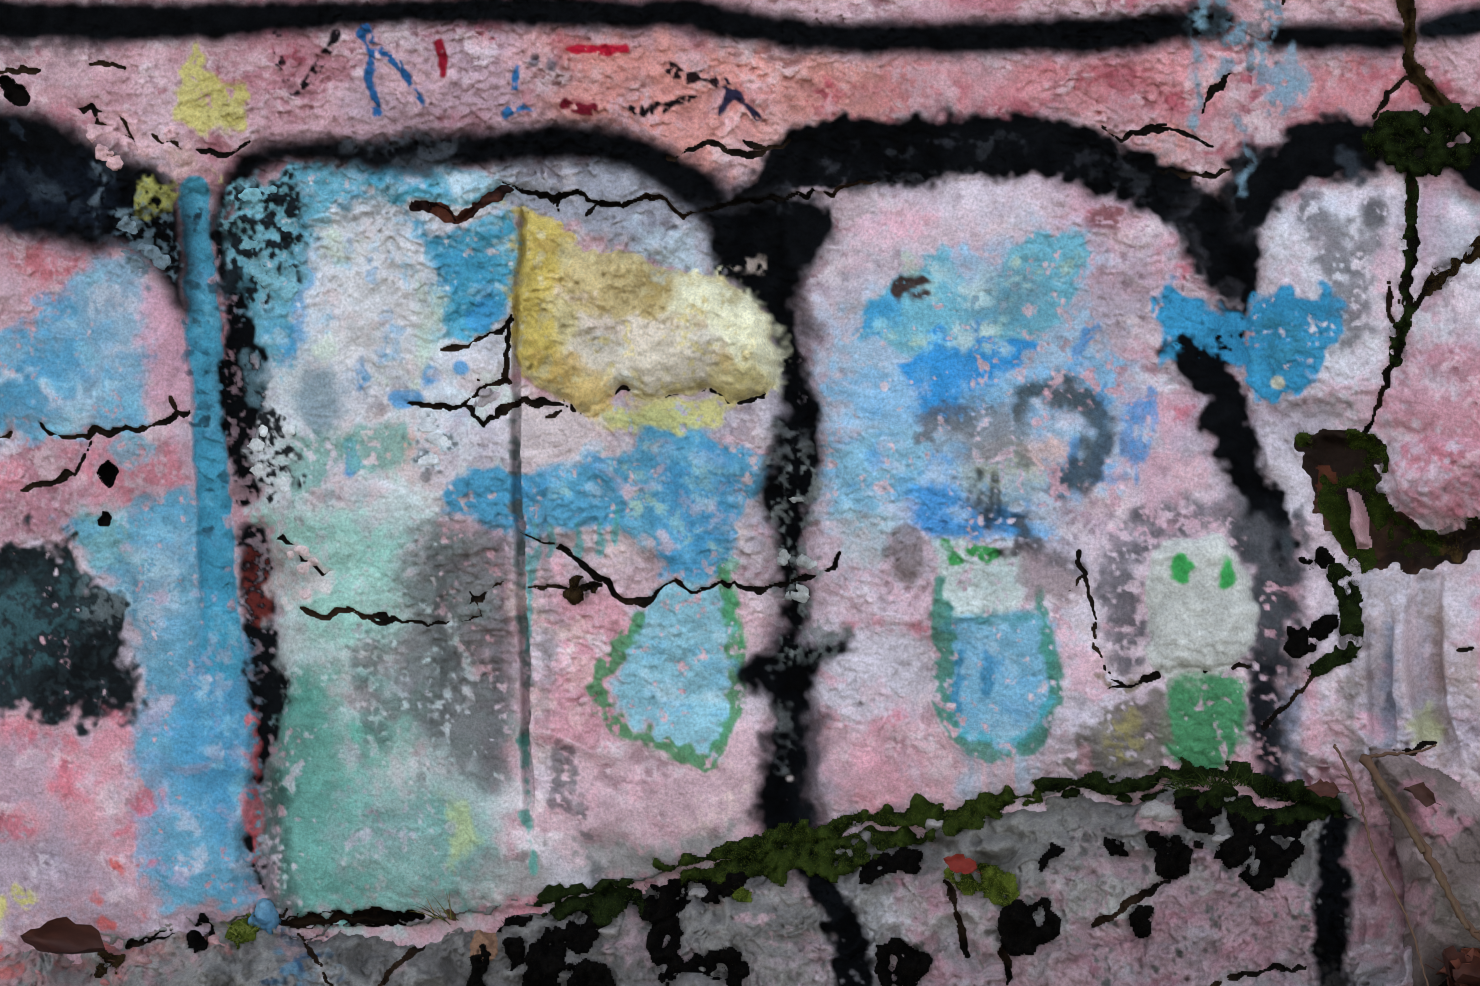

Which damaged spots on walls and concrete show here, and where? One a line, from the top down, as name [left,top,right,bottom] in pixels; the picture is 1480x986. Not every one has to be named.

crack [1372,53,1410,120]
crack [0,395,190,492]
crack [407,314,631,428]
crack [665,388,766,405]
crack [276,532,841,627]